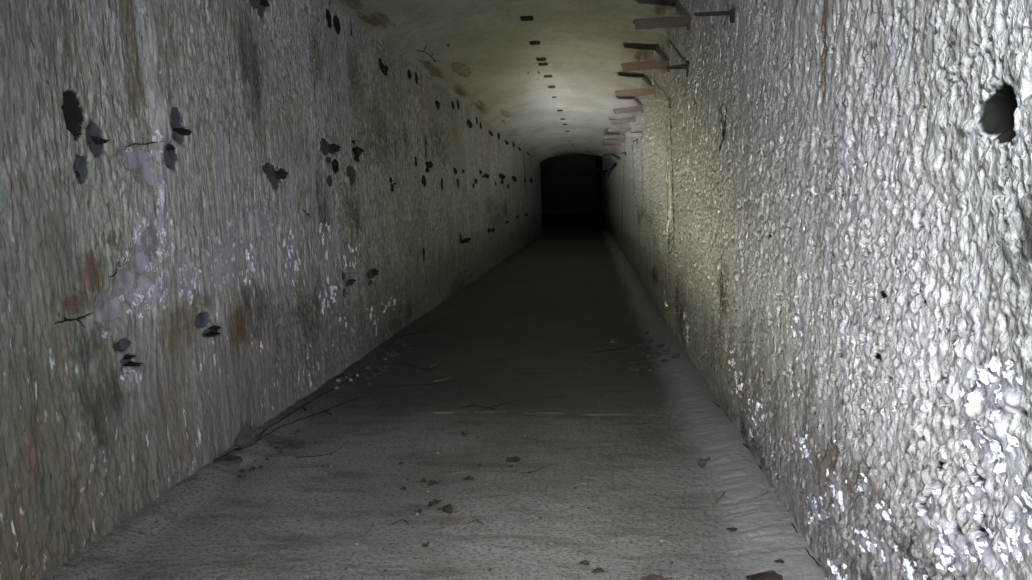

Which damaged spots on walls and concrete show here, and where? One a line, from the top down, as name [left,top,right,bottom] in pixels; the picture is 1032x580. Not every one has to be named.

rust [819,0,829,109]
spalling [61,90,110,184]
flaking render [119,107,192,186]
spalling [262,162,289,190]
spalling [320,137,364,187]
spalling [979,84,1017,143]
crack [53,312,94,328]
flaking render [94,219,170,377]
spalling [194,311,222,337]
leakage [119,176,301,348]
leakage [960,356,1023,409]
leakage [852,421,1032,580]